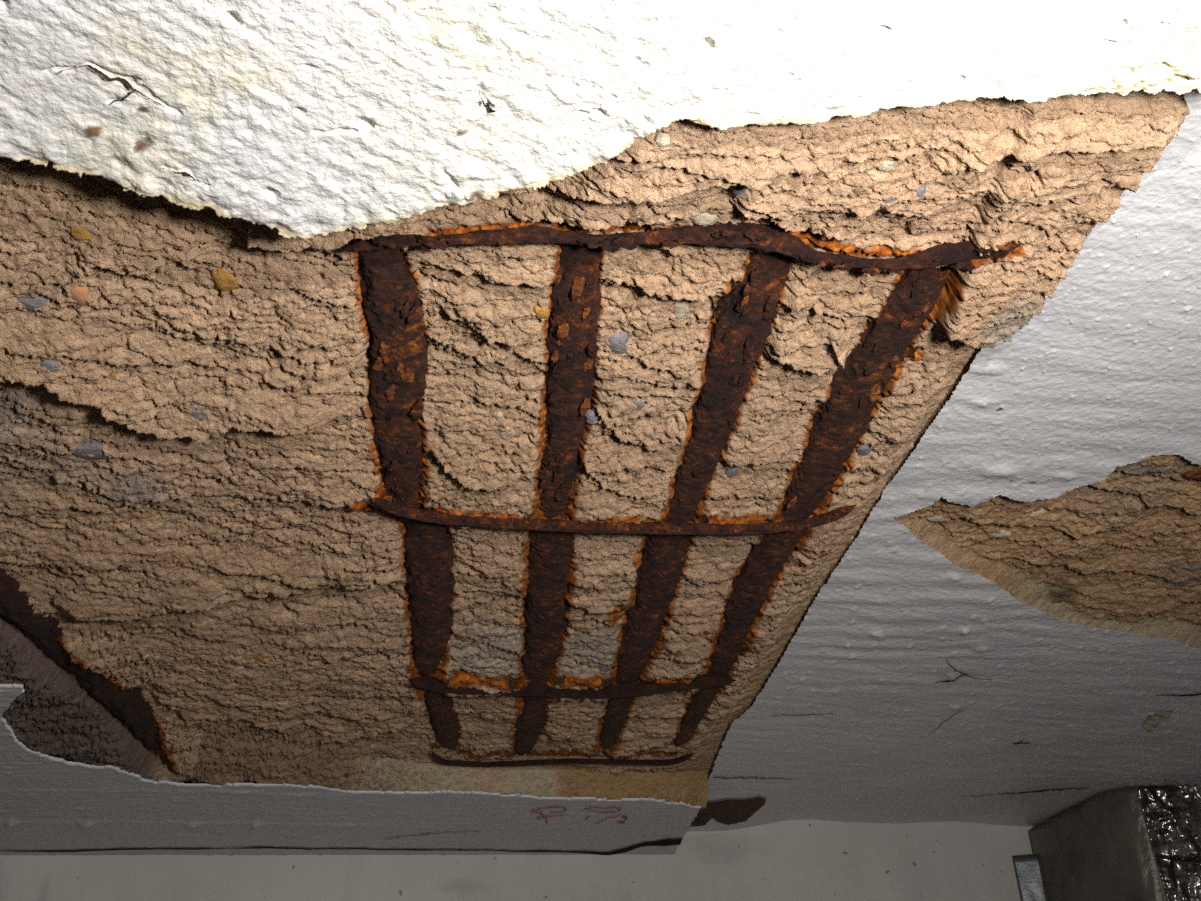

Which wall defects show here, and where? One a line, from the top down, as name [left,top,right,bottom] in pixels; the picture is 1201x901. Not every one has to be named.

rust [347,219,840,759]
spalling [0,89,1201,809]
rust [703,229,1025,719]